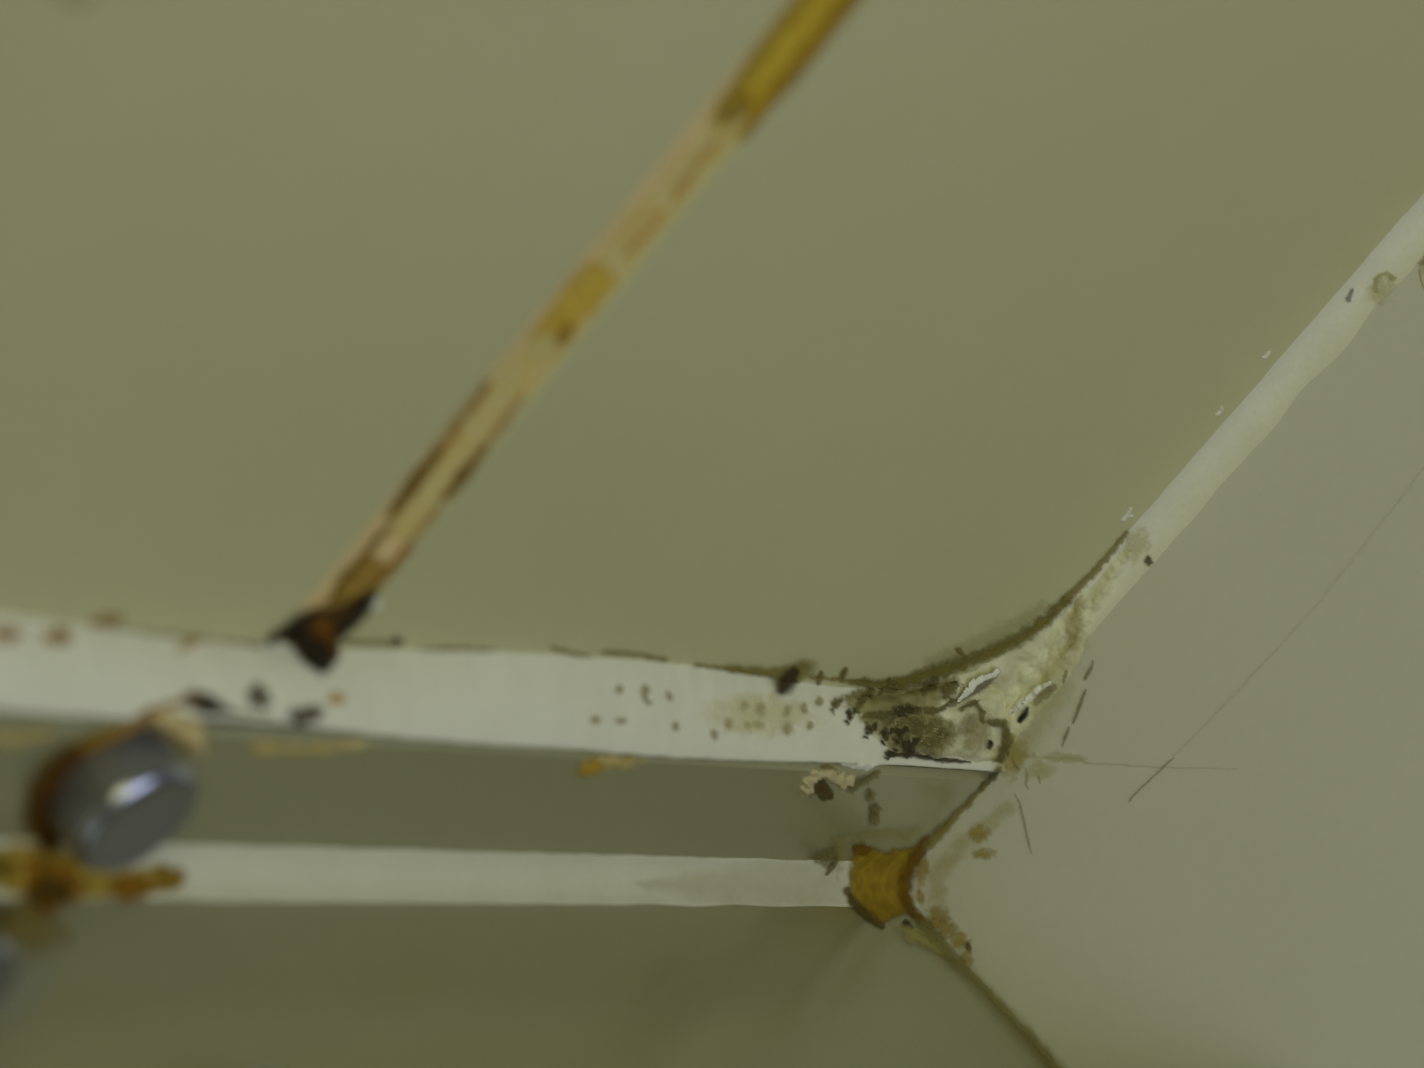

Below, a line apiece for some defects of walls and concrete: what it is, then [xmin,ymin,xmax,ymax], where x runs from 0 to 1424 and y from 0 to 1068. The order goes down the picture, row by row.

water stain [551,646,668,662]
mould [641,685,673,705]
mould [711,701,766,739]
water stain [783,668,1029,763]
corrosion [0,718,184,916]
spalling [800,761,882,825]
corrosion [970,826,990,858]
corrosion [813,835,972,964]